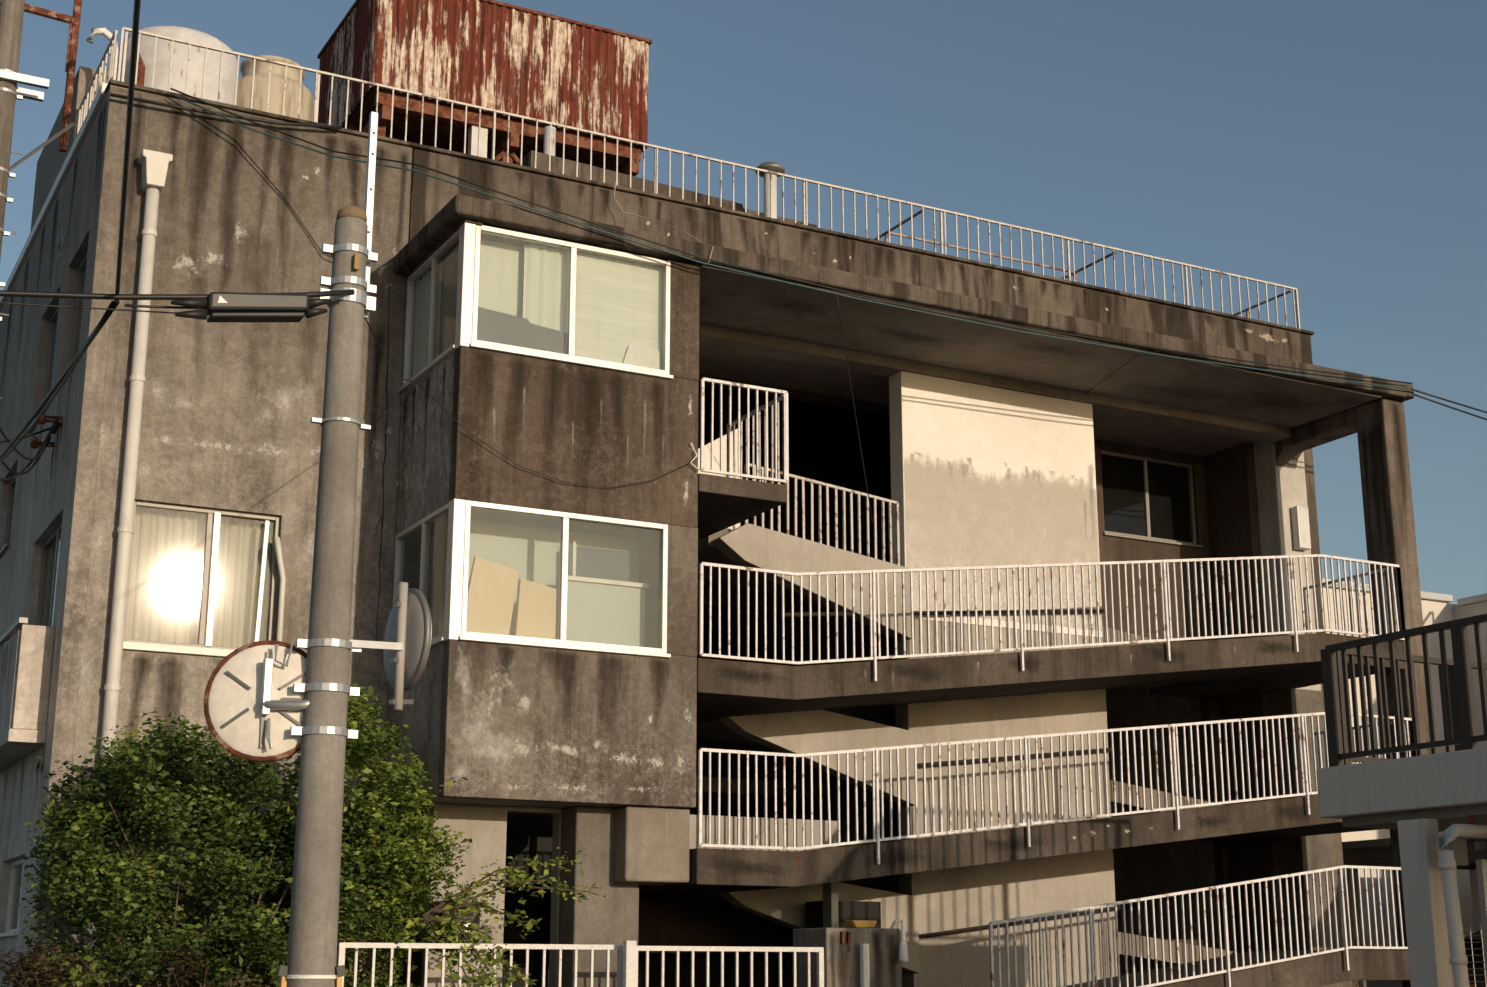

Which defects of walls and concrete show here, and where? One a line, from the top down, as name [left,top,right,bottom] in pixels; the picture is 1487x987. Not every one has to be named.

leakage [197,114,242,243]
leakage [327,137,359,197]
leakage [904,452,1100,628]
leakage [502,647,513,670]
leakage [549,652,575,698]
leakage [655,661,665,697]